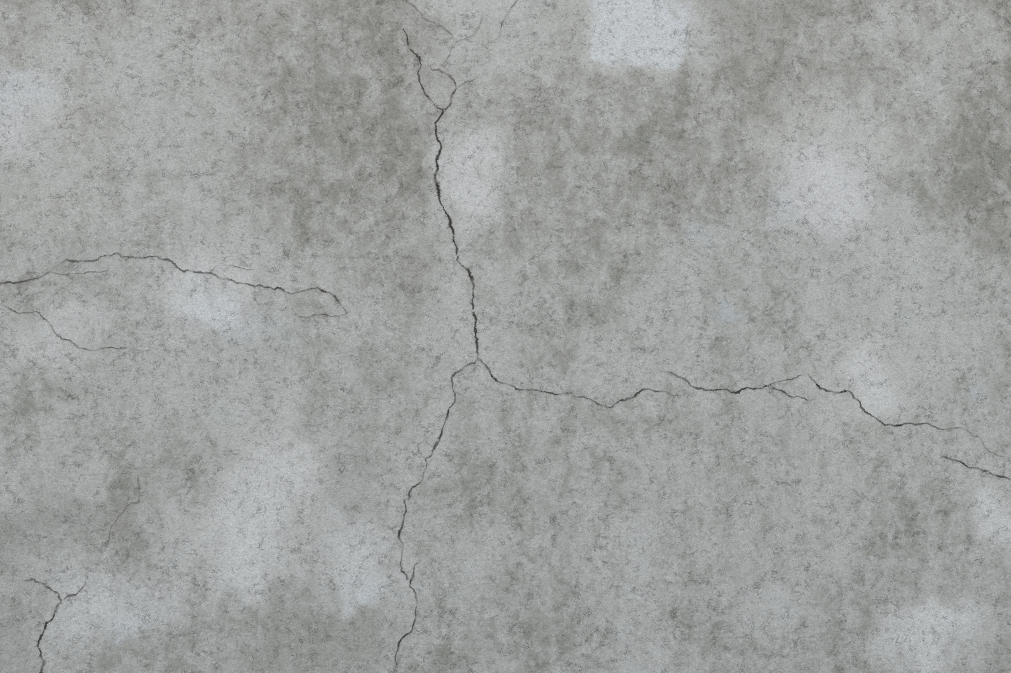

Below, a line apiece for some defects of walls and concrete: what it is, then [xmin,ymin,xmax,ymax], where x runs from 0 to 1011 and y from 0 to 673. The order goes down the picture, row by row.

crack [0,250,350,353]
crack [392,0,1011,669]
crack [21,576,88,673]